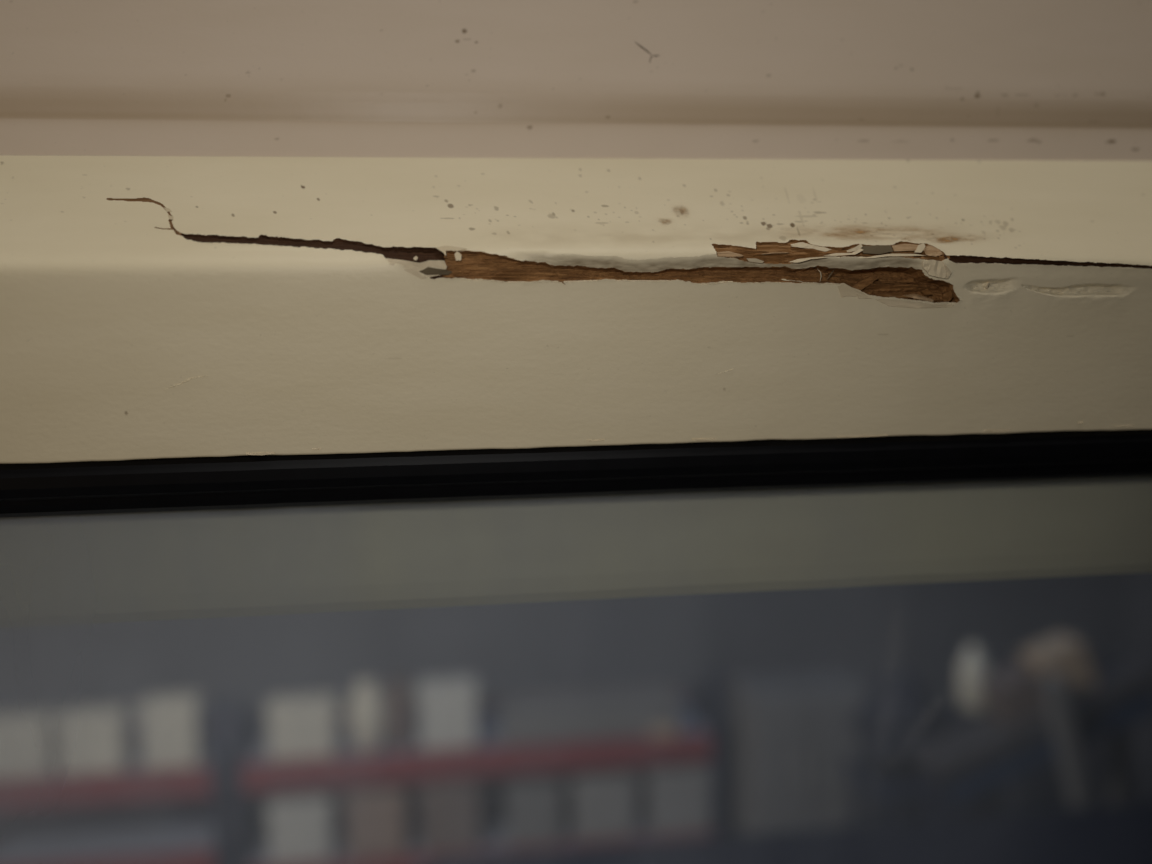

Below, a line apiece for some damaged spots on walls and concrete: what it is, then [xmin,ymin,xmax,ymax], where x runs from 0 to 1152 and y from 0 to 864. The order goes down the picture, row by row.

crack [107,197,1152,308]
peeling [712,240,950,264]